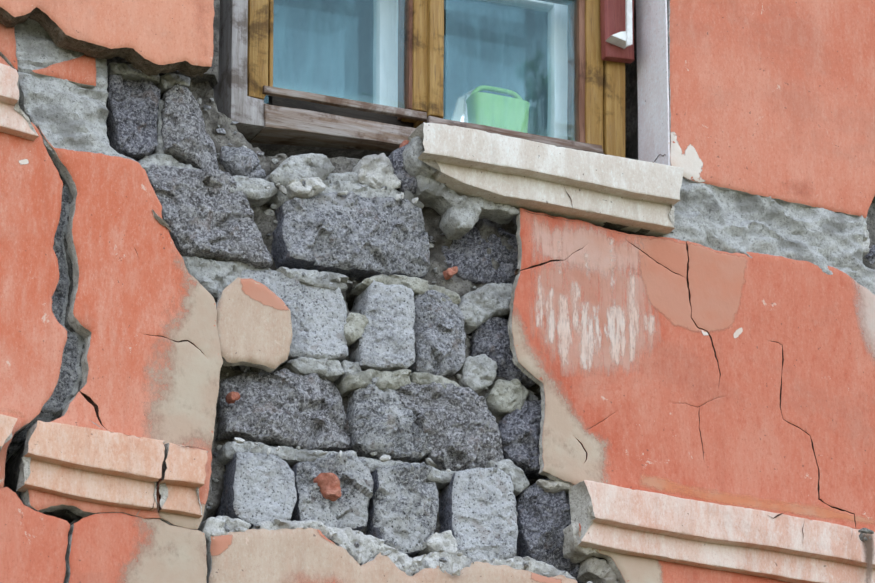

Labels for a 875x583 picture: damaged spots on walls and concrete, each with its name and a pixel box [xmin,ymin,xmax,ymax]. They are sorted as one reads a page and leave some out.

crack [5,166,86,464]
spalling [14,18,662,583]
spalling [534,132,875,370]
crack [136,481,163,516]